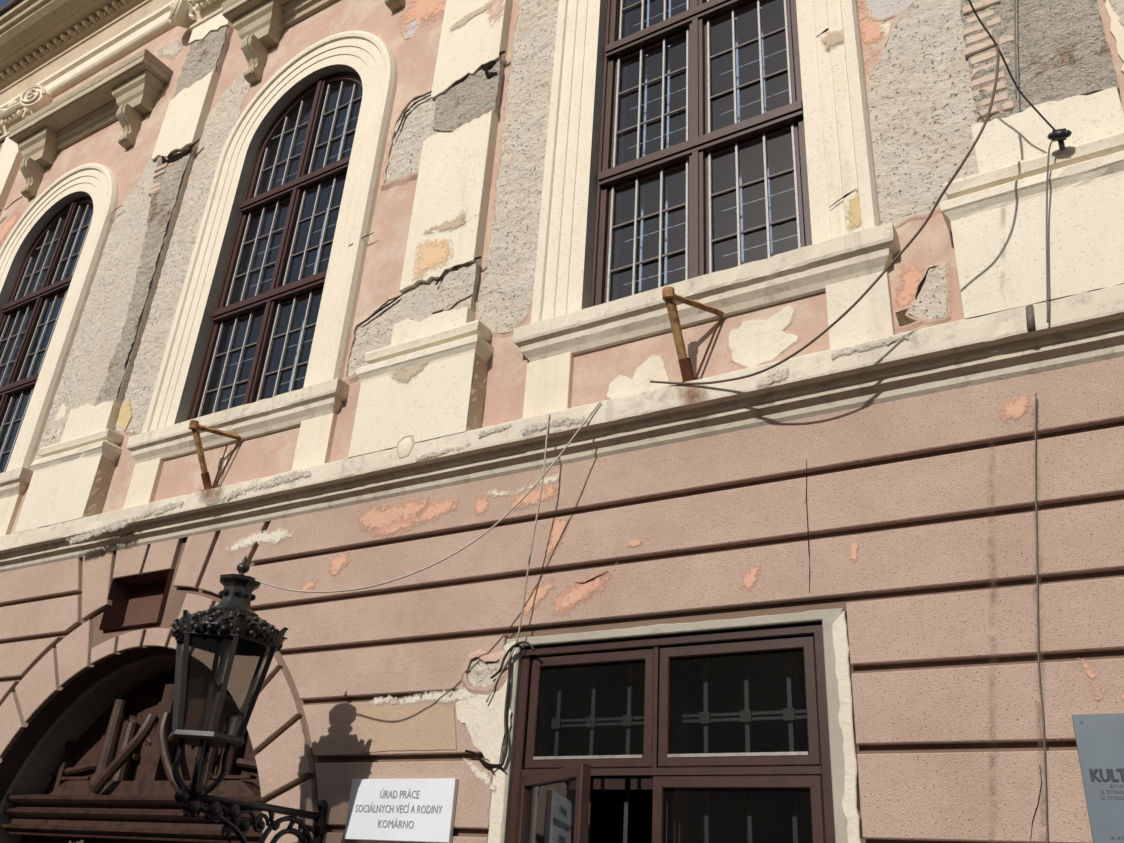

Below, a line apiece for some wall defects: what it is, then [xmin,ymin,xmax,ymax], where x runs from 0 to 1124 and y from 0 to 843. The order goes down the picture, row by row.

spalling [858,0,1124,229]
spalling [381,0,559,338]
spalling [31,73,253,471]
spalling [343,292,402,385]
spalling [389,361,428,383]
peeling [1000,396,1029,421]
peeling [357,497,459,538]
peeling [475,473,559,516]
peeling [524,571,610,617]
peeling [359,649,512,791]